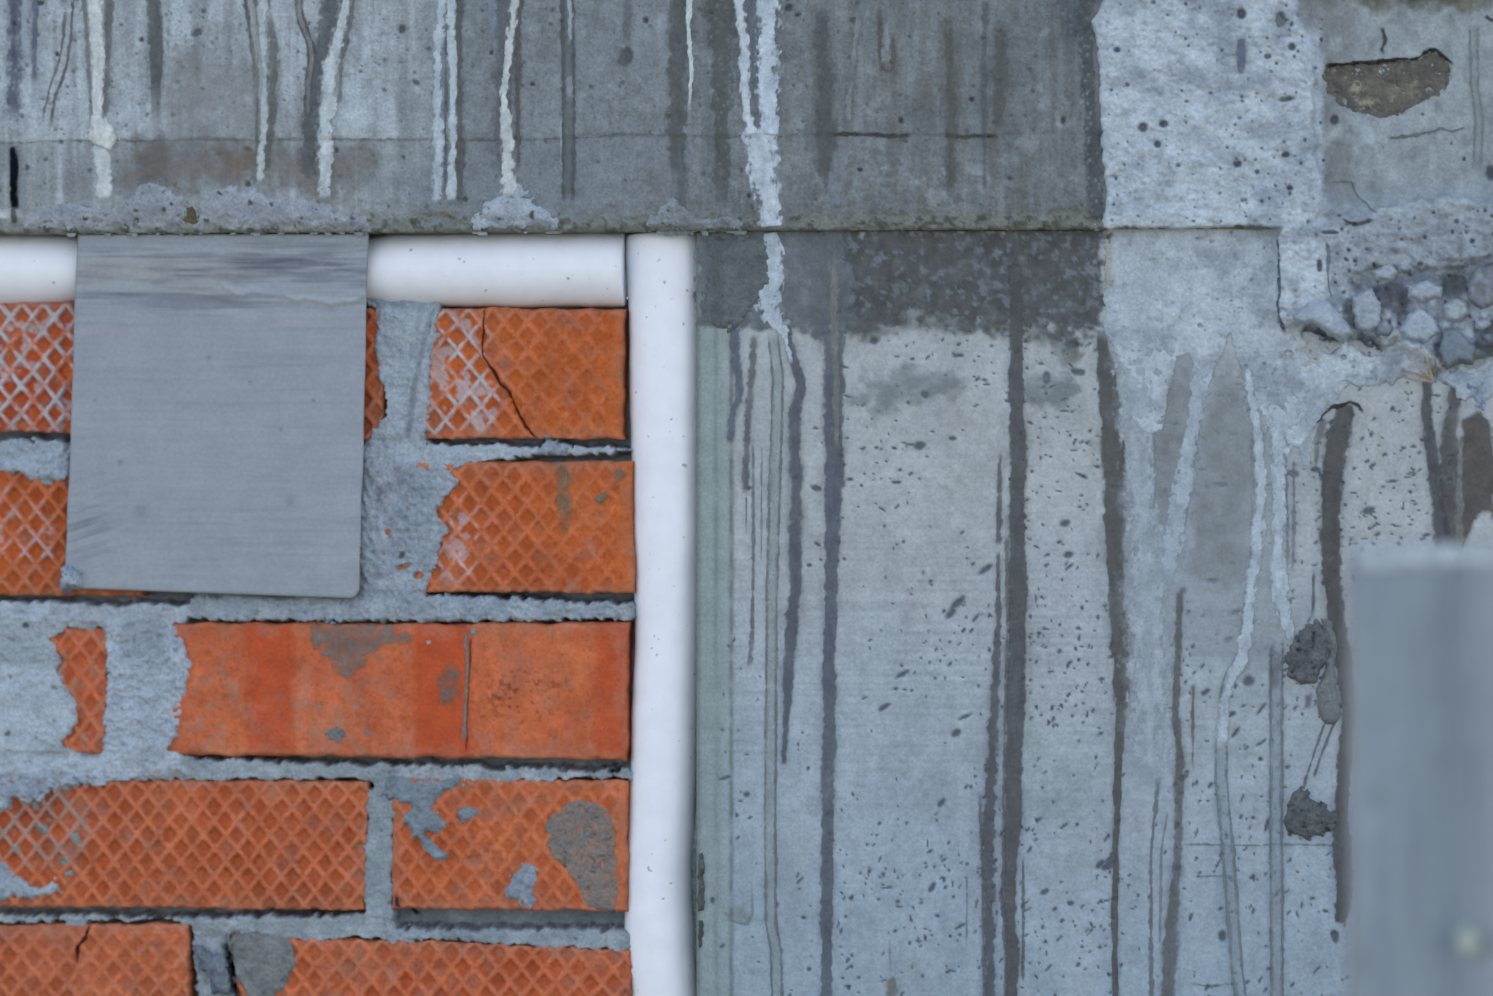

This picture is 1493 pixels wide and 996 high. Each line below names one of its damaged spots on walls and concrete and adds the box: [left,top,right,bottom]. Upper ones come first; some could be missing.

damp [6,0,376,199]
efflorescence [431,0,465,202]
damp [490,0,524,195]
damp [558,0,576,196]
spalling [1322,51,1451,118]
crack [482,312,534,436]
damp [665,0,1353,996]
damp [1421,383,1493,548]